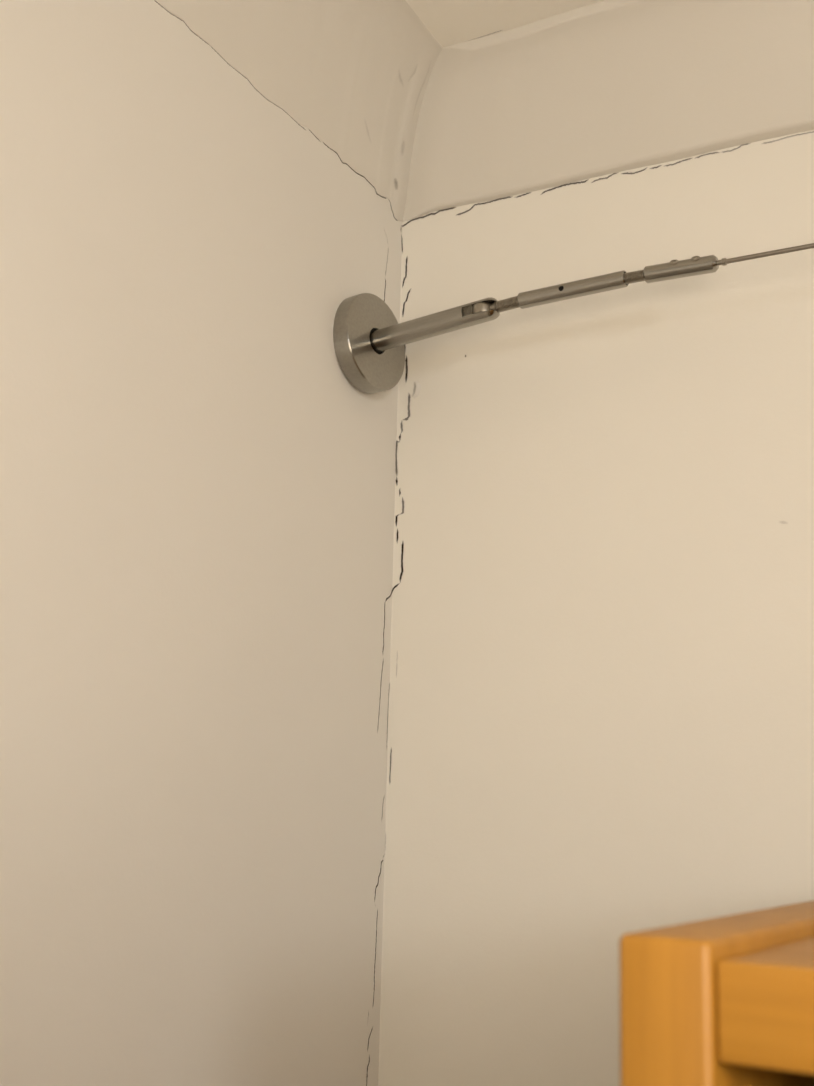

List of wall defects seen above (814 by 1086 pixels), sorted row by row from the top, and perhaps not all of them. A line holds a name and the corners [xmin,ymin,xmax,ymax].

crack [154,0,814,318]
crack [366,345,411,1086]